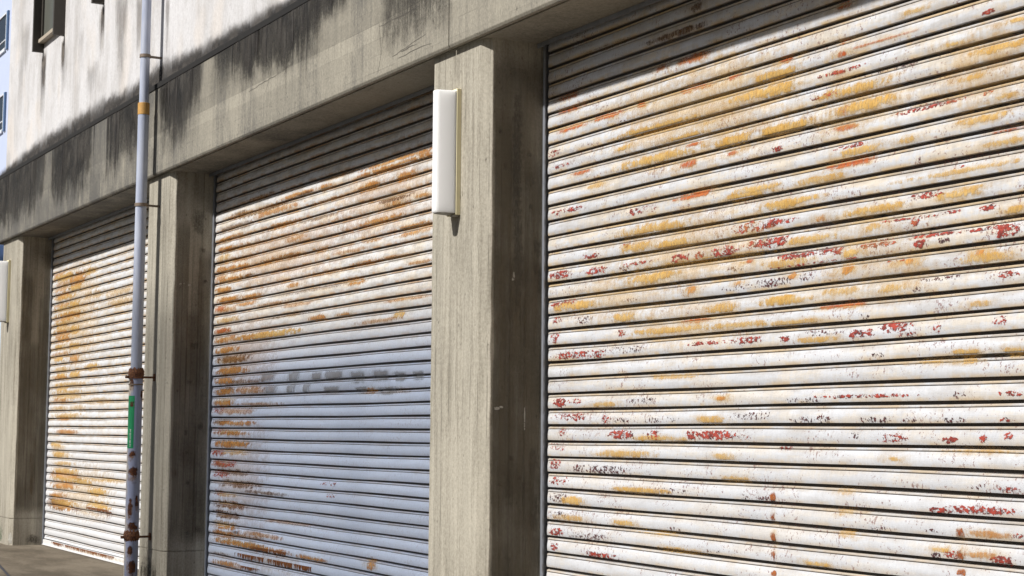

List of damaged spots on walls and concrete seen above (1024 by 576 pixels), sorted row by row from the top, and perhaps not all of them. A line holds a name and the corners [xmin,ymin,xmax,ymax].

damp [0,0,344,217]
rust [617,114,812,170]
rust [239,147,432,230]
rust [360,193,430,237]
peeling [671,218,896,291]
rust [54,267,99,400]
peeling [807,314,916,339]
rust [211,253,350,574]
peeling [785,393,919,404]
rust [49,416,113,517]
peeling [929,505,1016,515]
peeling [989,555,1013,567]